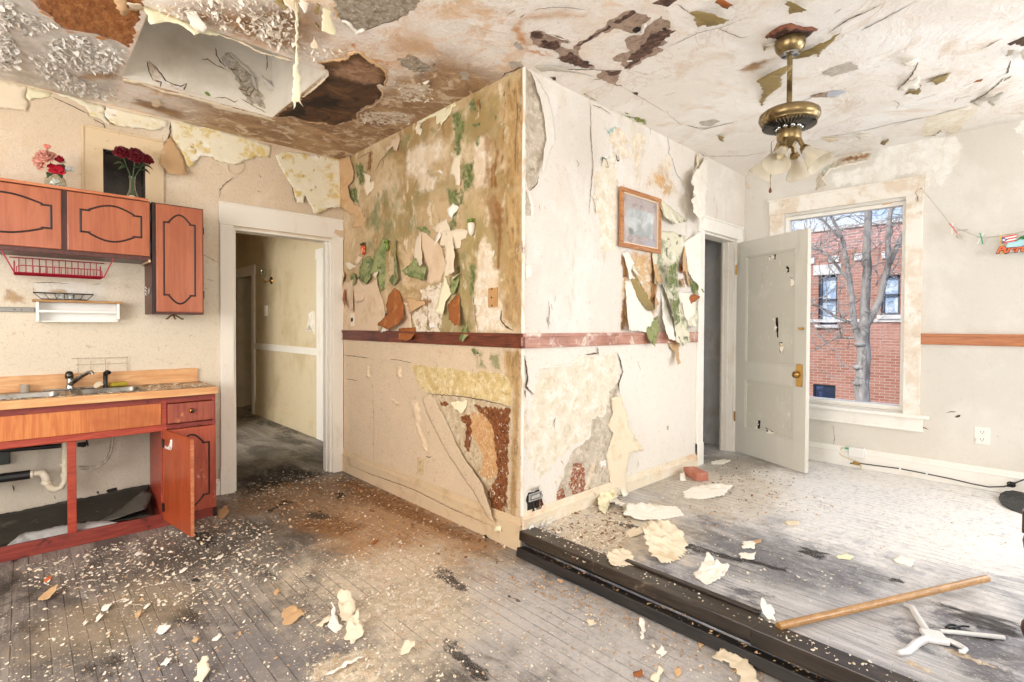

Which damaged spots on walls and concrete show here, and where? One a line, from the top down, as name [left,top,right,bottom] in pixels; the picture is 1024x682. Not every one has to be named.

crack [830,5,909,32]
leakage [124,96,187,120]
peeling [0,0,443,196]
spalling [509,0,677,217]
crack [833,41,1011,136]
peeling [472,134,493,191]
peeling [815,152,871,190]
peeling [345,255,362,286]
peeling [381,273,460,332]
peeling [473,234,506,333]
peeling [593,127,676,340]
peeling [412,348,629,530]